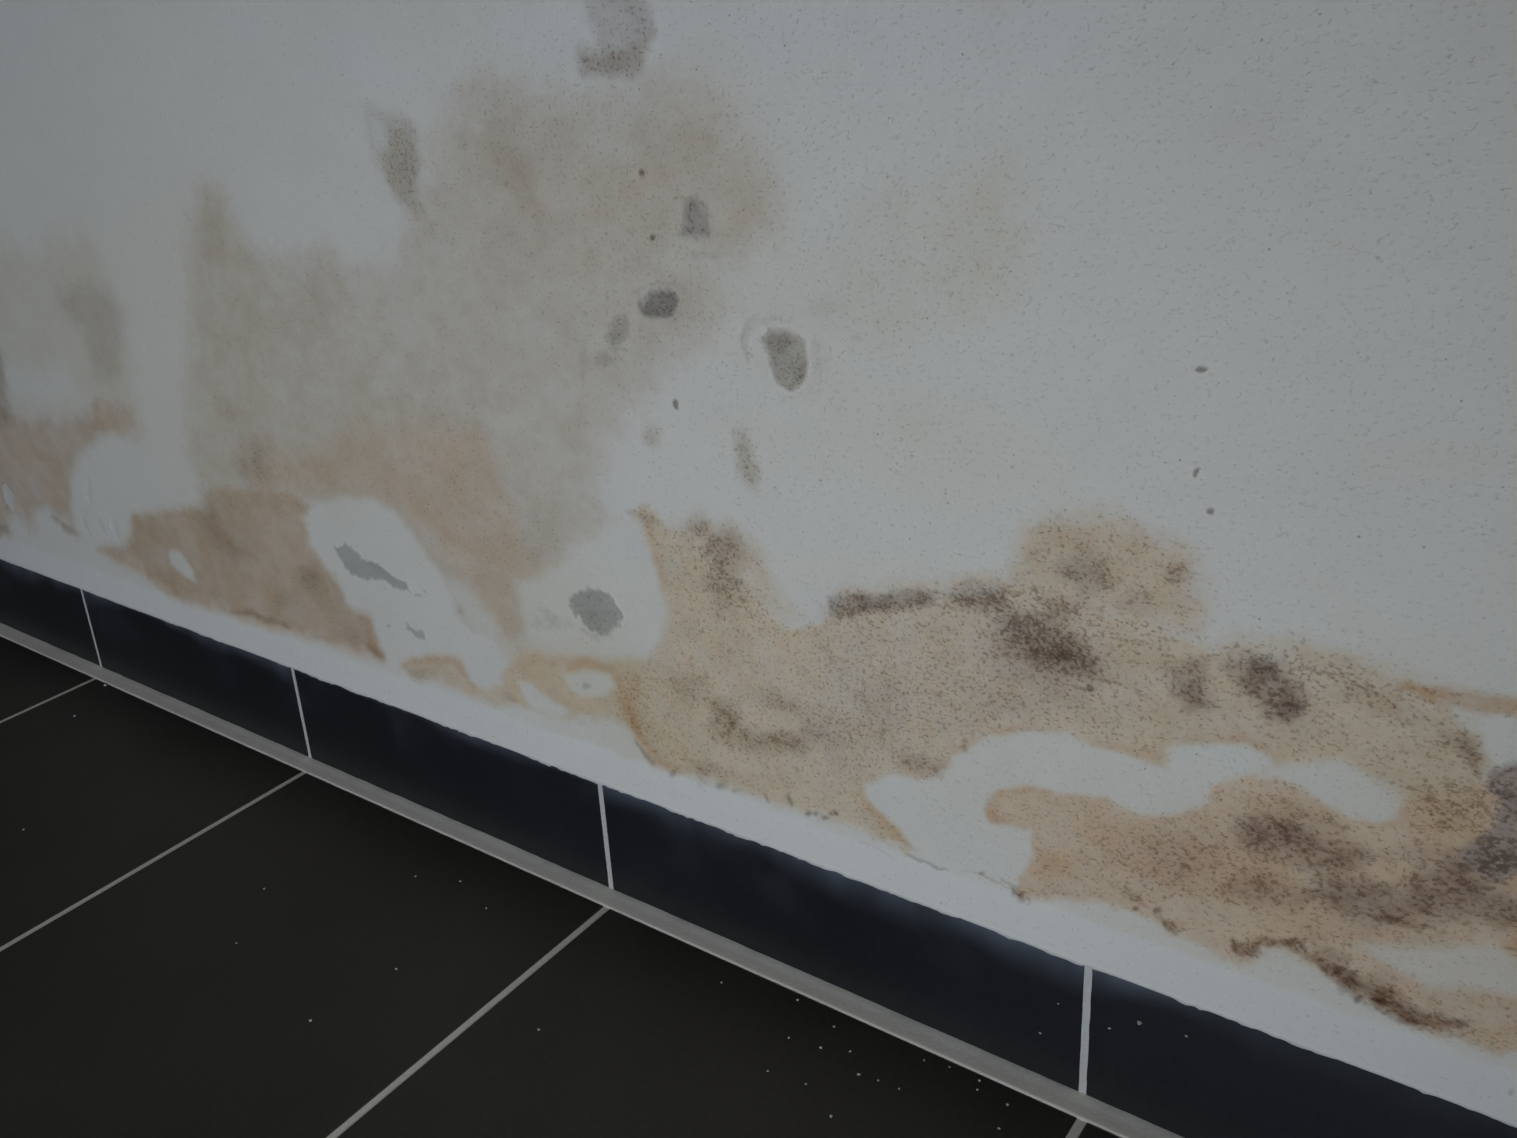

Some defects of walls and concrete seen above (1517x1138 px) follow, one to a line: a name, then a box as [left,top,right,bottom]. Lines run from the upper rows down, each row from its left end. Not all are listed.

leakage [0,198,157,551]
leakage [91,0,836,737]
leakage [802,111,1068,381]
peeling [332,538,429,599]
peeling [528,584,634,646]
leakage [613,494,1517,1065]